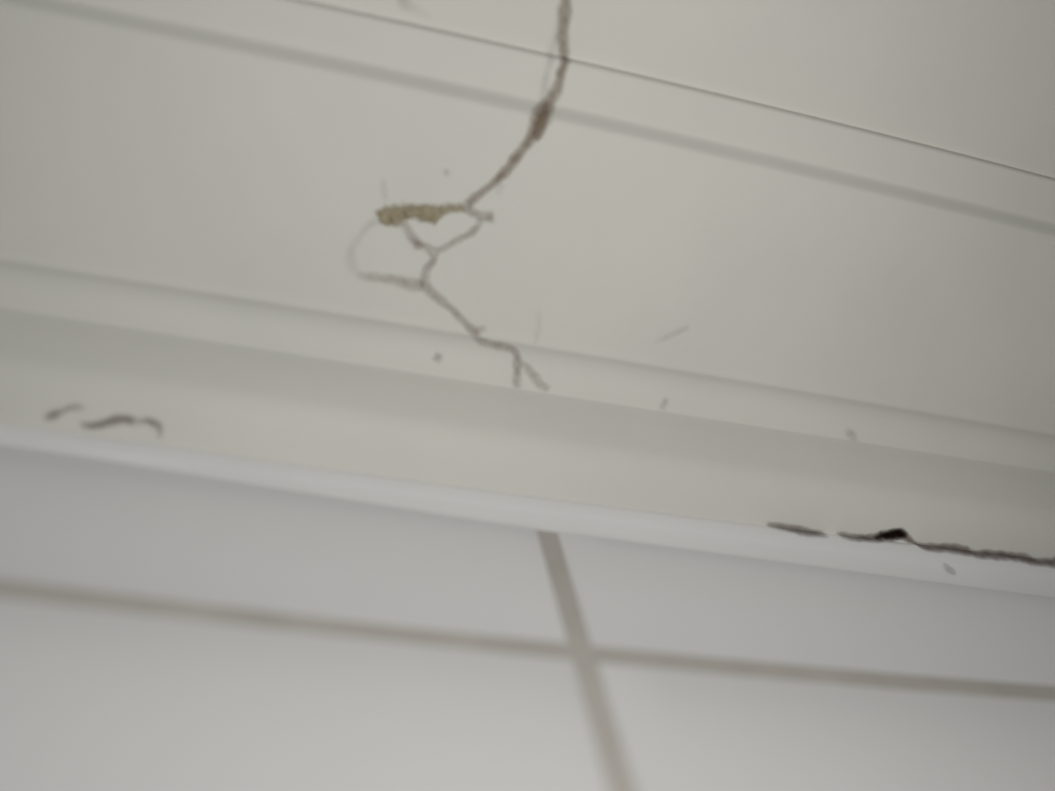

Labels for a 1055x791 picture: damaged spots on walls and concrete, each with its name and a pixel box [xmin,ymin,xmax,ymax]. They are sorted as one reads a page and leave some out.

crack [496,101,550,181]
crack [790,527,817,535]
crack [855,529,1055,565]